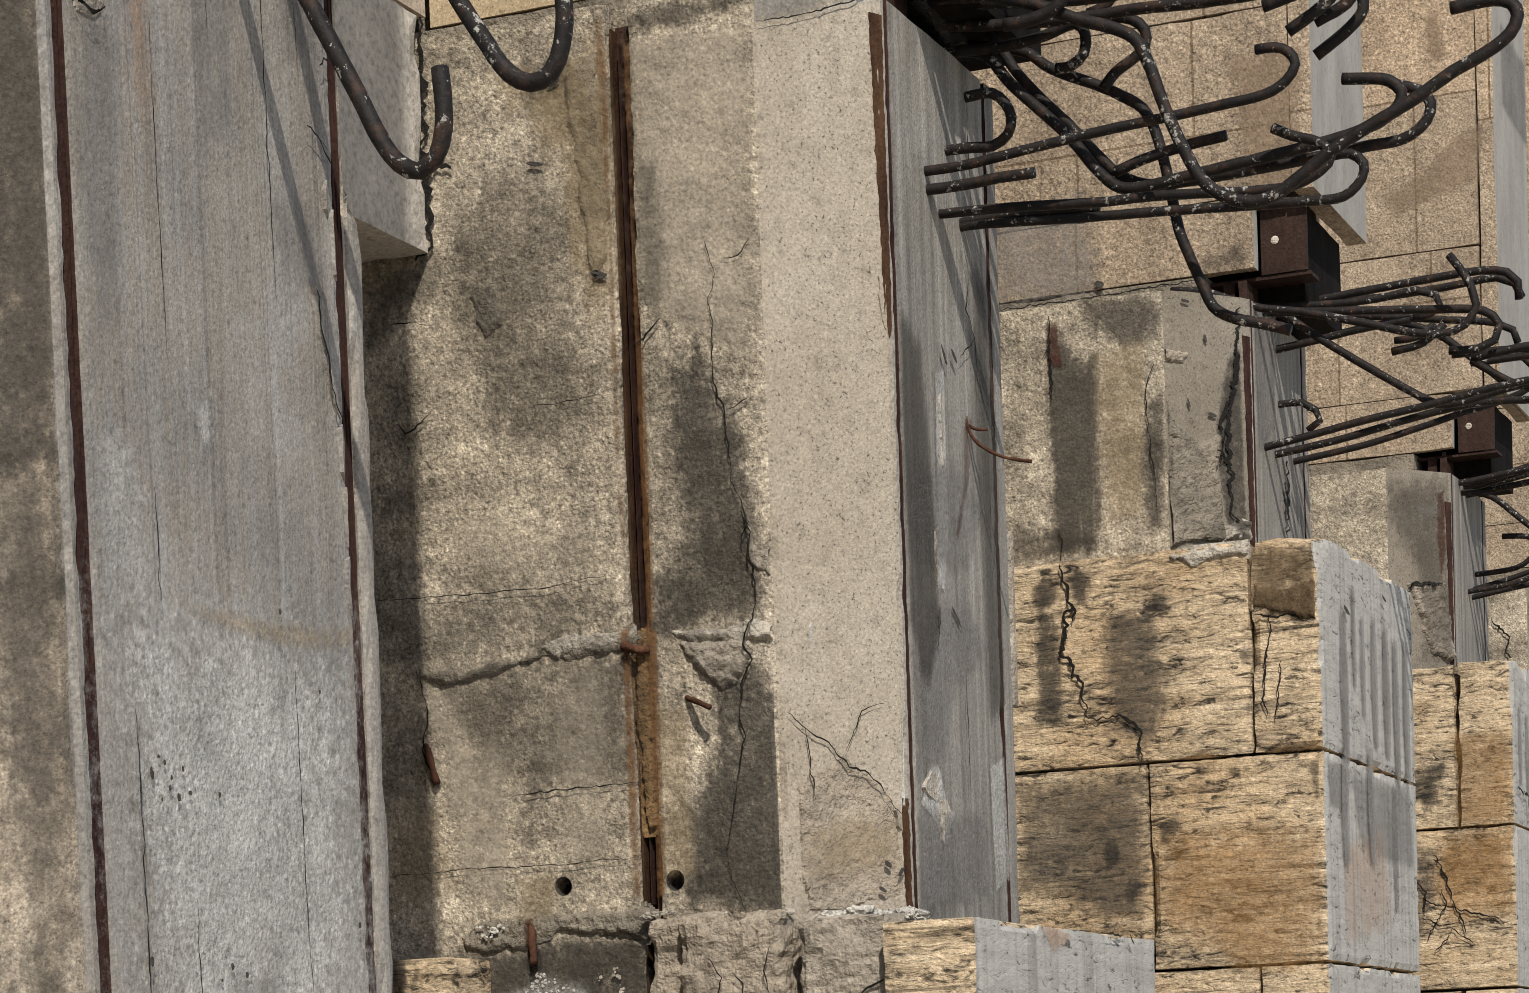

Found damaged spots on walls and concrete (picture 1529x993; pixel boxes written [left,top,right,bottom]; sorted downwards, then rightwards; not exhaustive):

crack [415,16,451,260]
damp [0,0,74,894]
corrosion [620,343,664,895]
damp [653,355,758,633]
crack [704,238,756,913]
damp [687,664,782,912]
crack [787,703,901,813]
peeling [921,771,953,844]
crack [1058,530,1143,765]
damp [1104,594,1168,740]
crack [1217,307,1241,522]
crack [1249,611,1314,719]